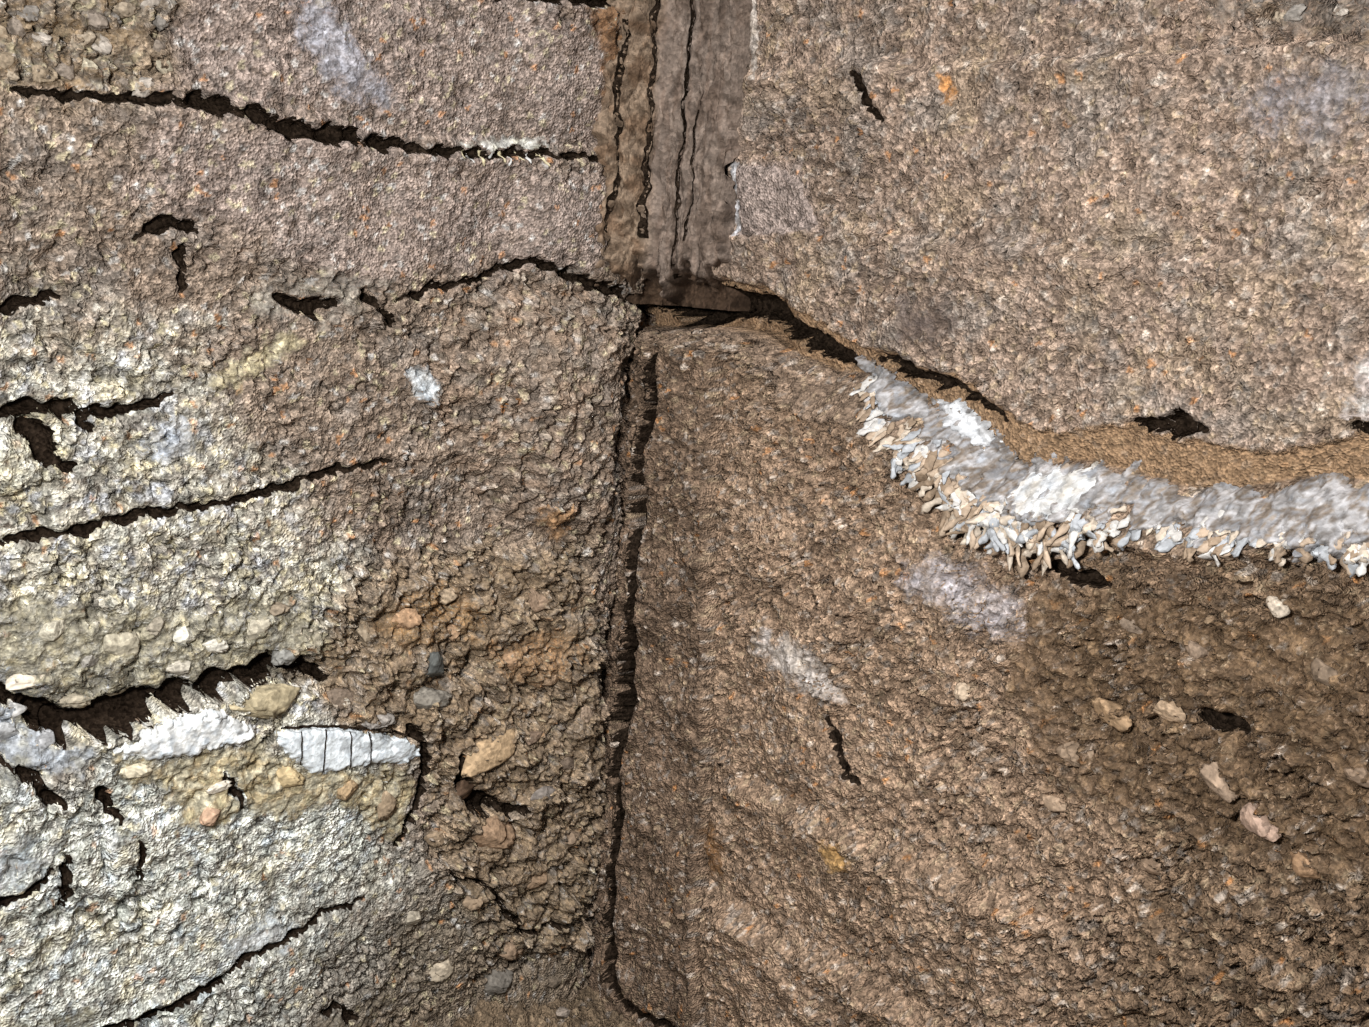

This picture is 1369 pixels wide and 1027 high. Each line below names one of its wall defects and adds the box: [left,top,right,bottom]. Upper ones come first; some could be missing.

crack [1134,407,1209,441]
crack [1352,420,1369,434]
leakage [849,354,1369,578]
crack [0,0,1009,1027]
leakage [113,708,255,760]
leakage [274,724,420,774]